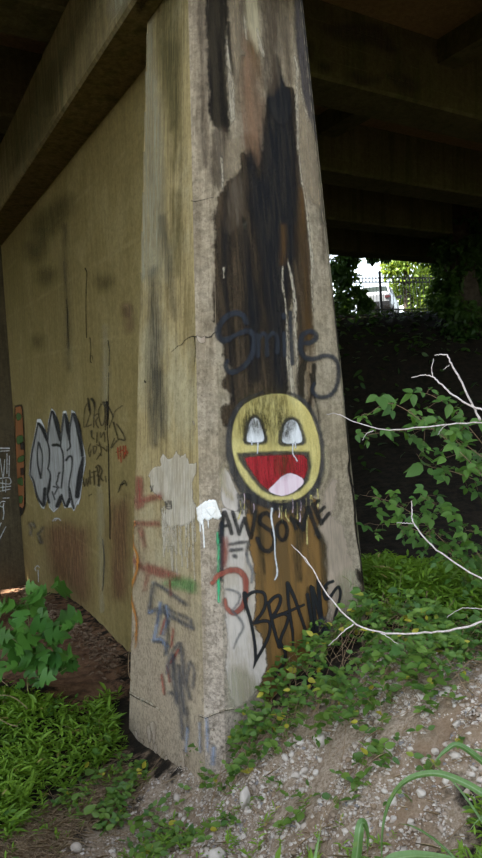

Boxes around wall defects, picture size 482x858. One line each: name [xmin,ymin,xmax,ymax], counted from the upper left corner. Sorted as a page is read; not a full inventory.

crack [175,333,214,357]
damp [201,0,324,427]